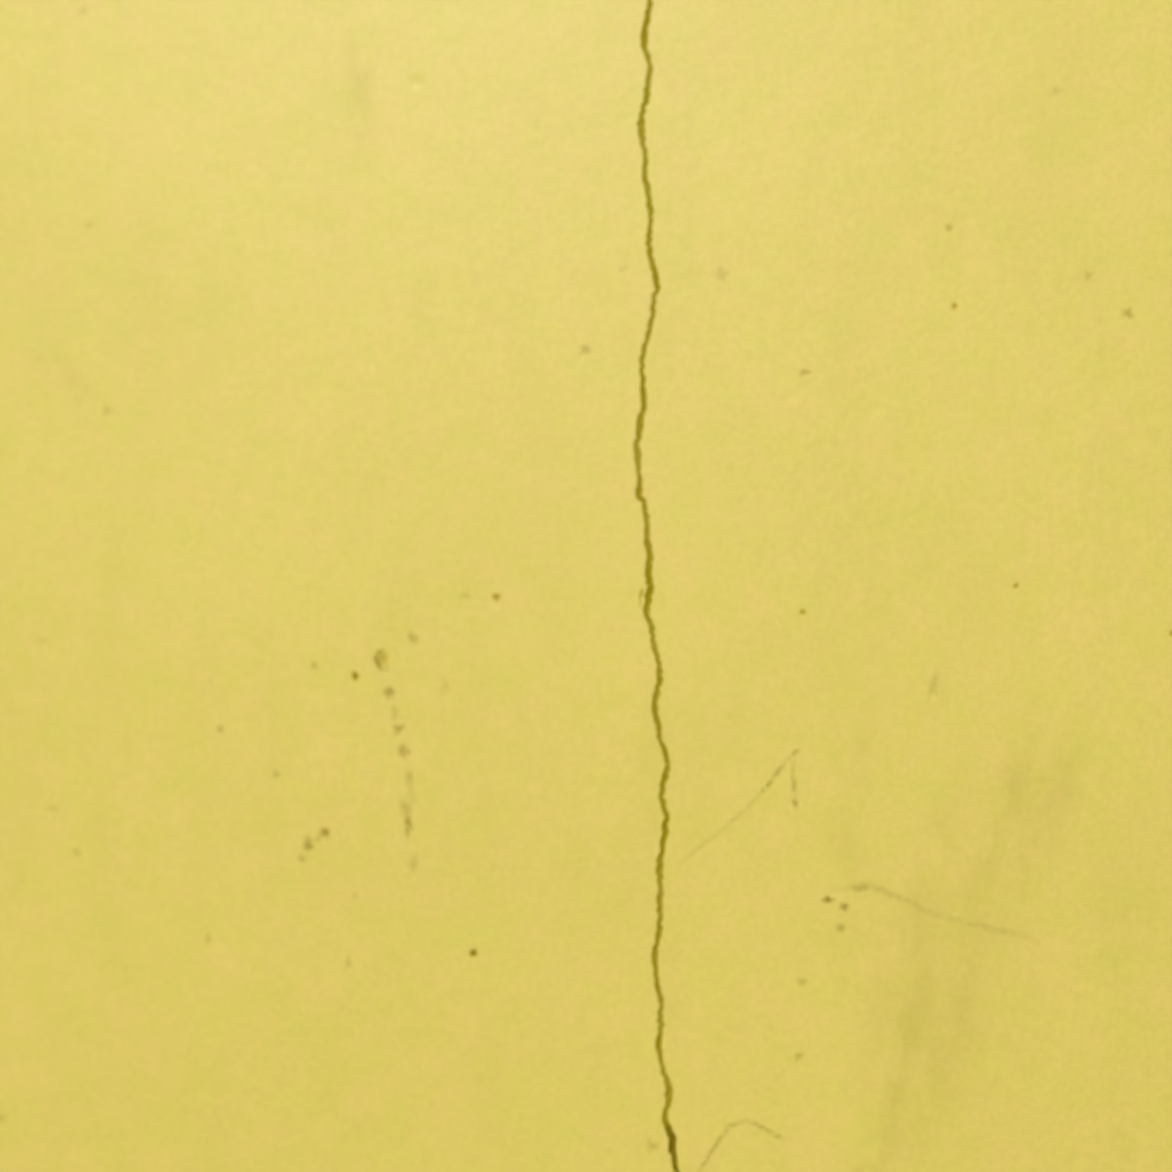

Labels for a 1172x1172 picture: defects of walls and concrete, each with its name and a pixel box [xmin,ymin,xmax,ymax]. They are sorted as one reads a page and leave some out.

crack [633,0,680,1172]